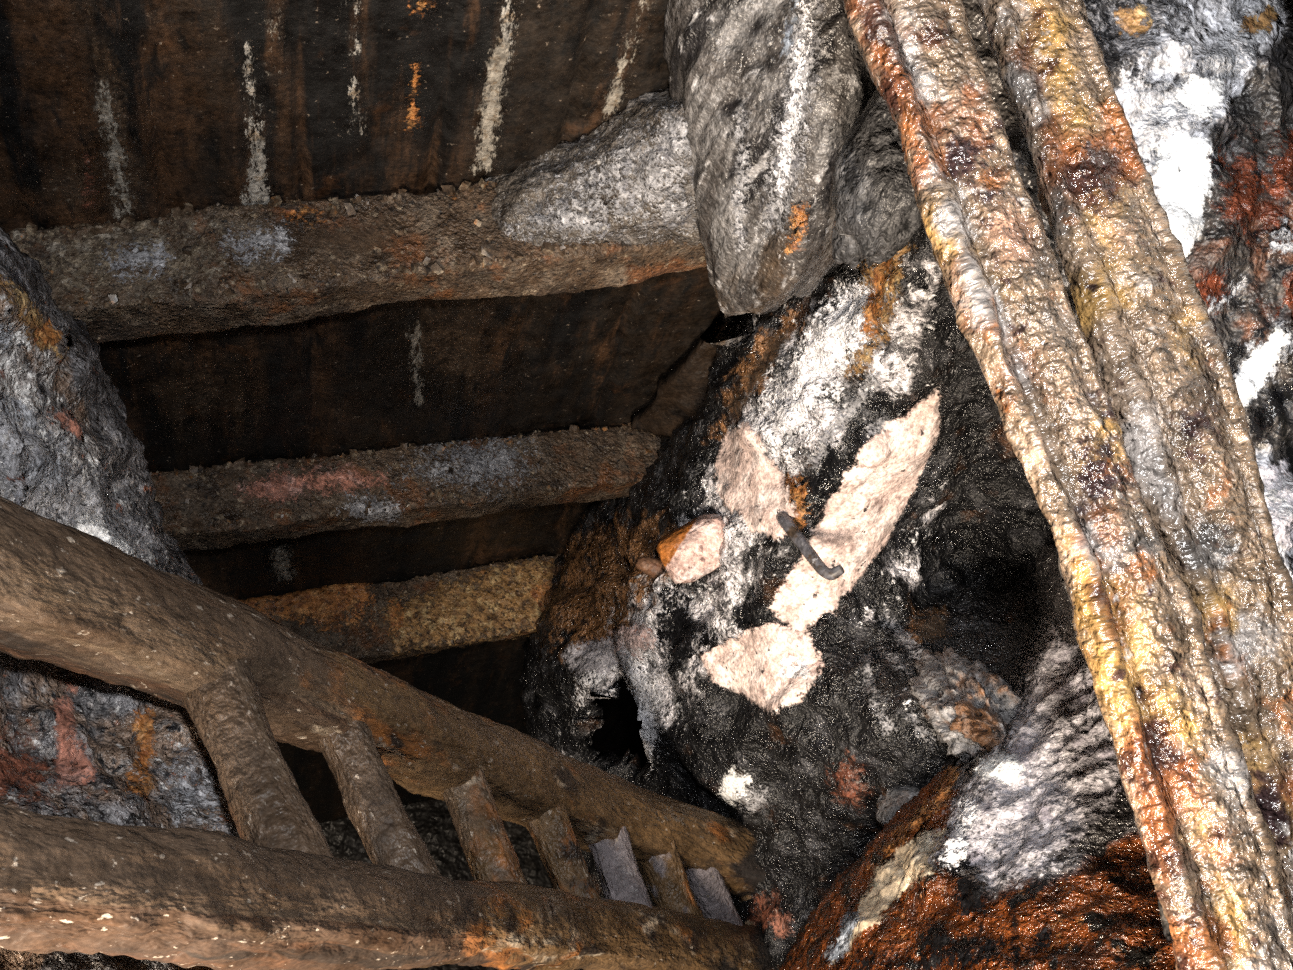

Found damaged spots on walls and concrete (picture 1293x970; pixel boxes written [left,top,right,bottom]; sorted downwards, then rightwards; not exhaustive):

efflorescence [470,0,519,173]
efflorescence [501,0,698,247]
rust [1211,129,1293,245]
rust [774,204,810,303]
rust [845,245,917,380]
rust [1189,267,1231,310]
rust [1256,271,1293,318]
rust [729,336,786,414]
rust [781,472,813,529]
rust [831,749,871,812]
rust [748,889,791,938]